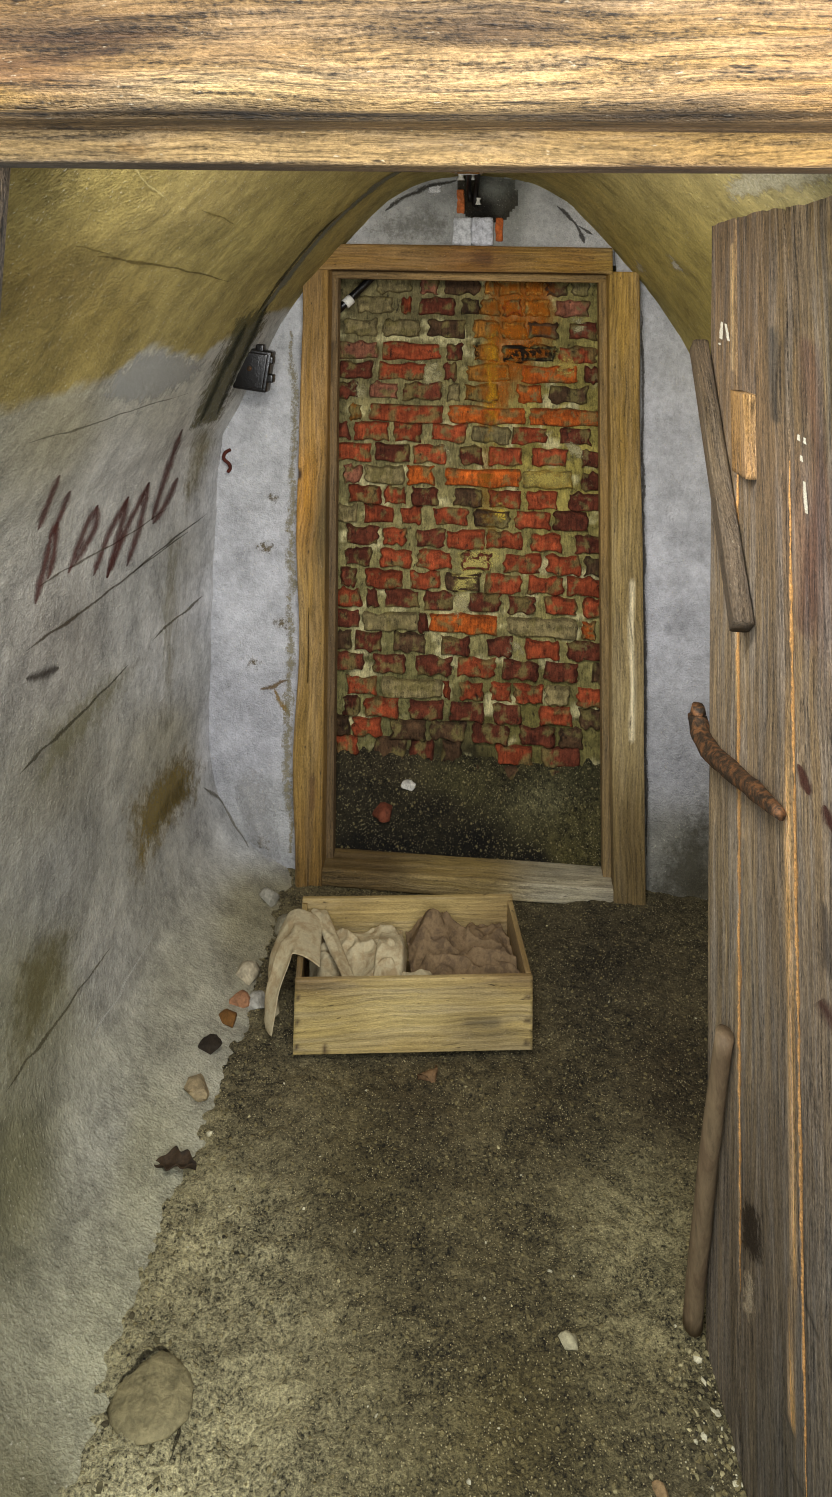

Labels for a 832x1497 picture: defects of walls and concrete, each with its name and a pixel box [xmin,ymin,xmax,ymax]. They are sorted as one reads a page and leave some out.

leakage [132,751,196,867]